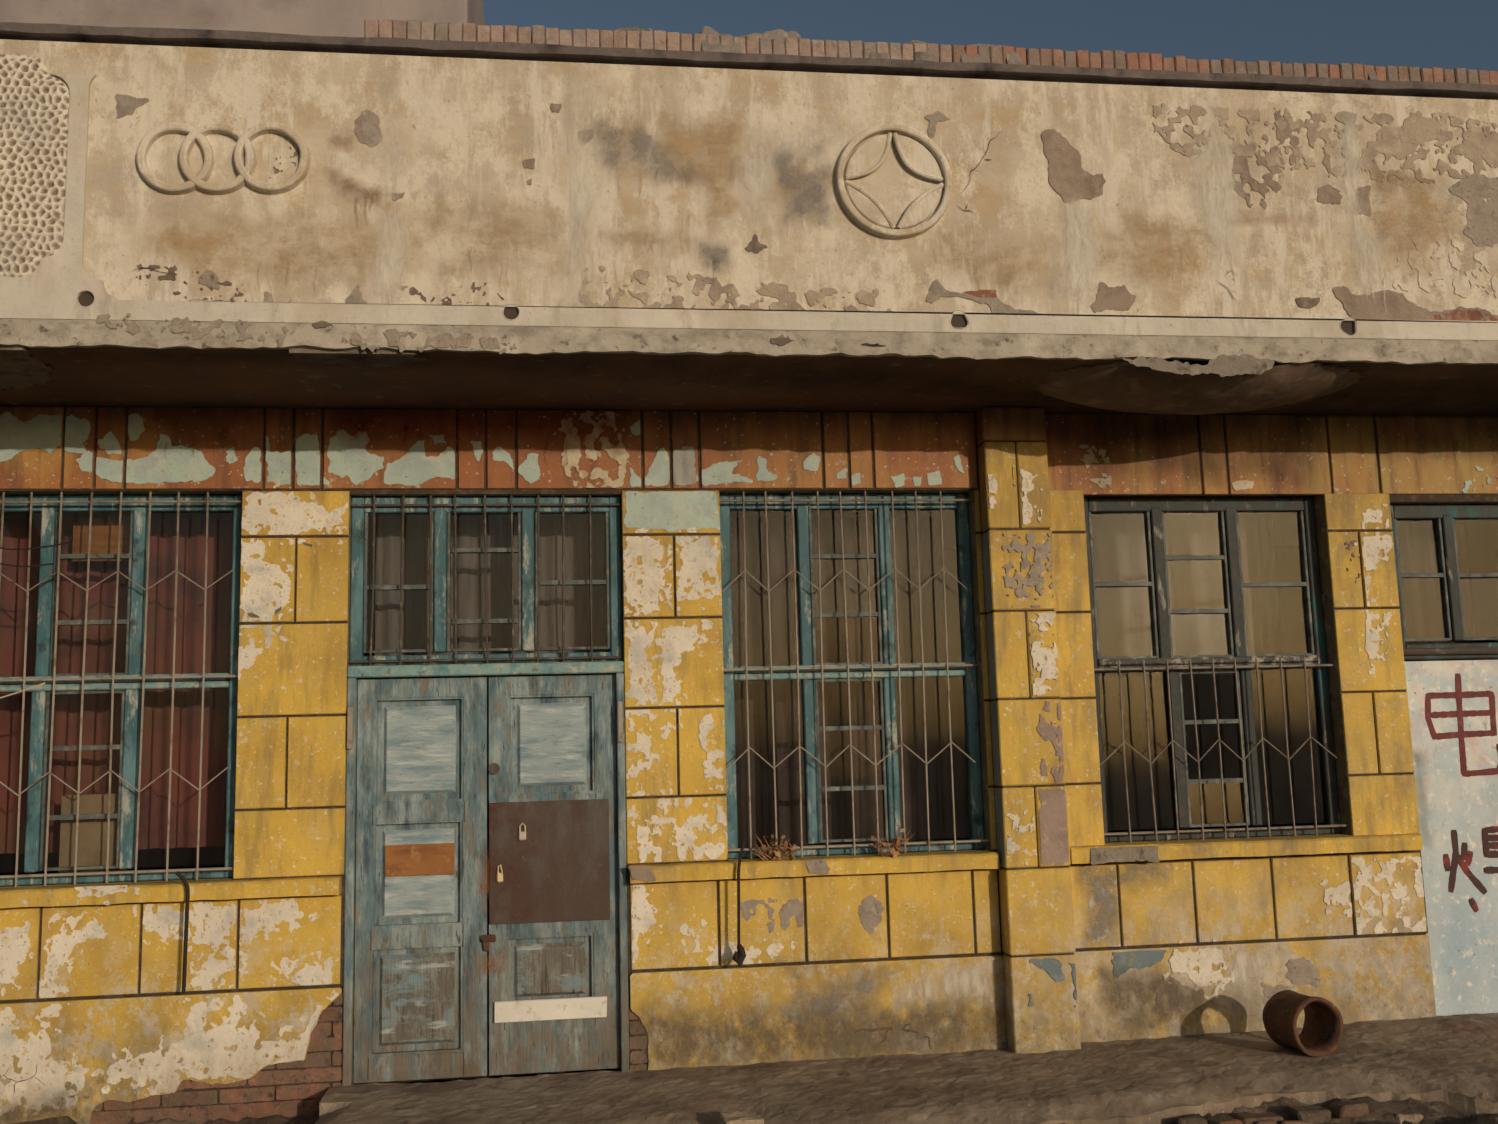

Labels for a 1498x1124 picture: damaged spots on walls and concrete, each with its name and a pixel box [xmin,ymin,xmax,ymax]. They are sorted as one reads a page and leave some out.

flaking render [1041,129,1106,203]
flaking render [1152,103,1498,321]
peeling [136,264,517,368]
peeling [470,441,541,484]
peeling [558,410,777,966]
peeling [988,465,1069,866]
peeling [680,898,804,966]
peeling [1085,846,1235,1014]
peeling [1319,856,1427,941]
flaking render [0,885,343,1124]
water stain [647,967,1008,1061]
water stain [1106,973,1204,1020]